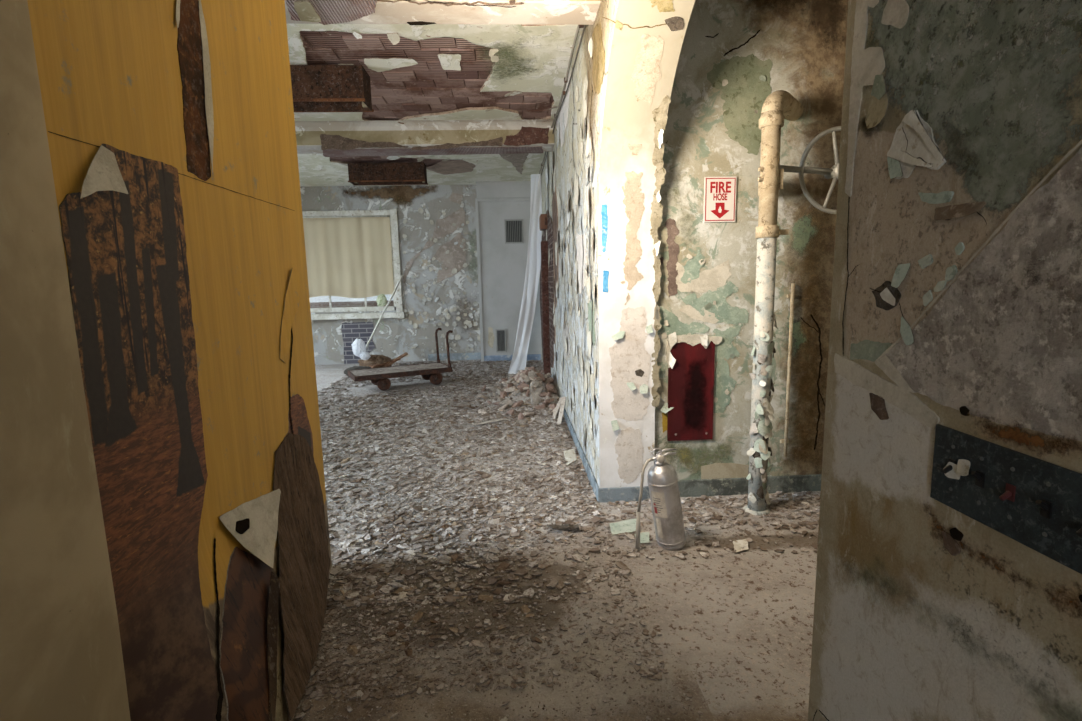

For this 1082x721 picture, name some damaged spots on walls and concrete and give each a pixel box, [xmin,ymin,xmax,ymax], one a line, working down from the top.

peeling [198,0,214,174]
peeling [707,54,773,155]
peeling [861,74,889,136]
peeling [887,110,947,179]
peeling [320,22,605,465]
peeling [609,95,778,505]
flaking render [869,140,1082,442]